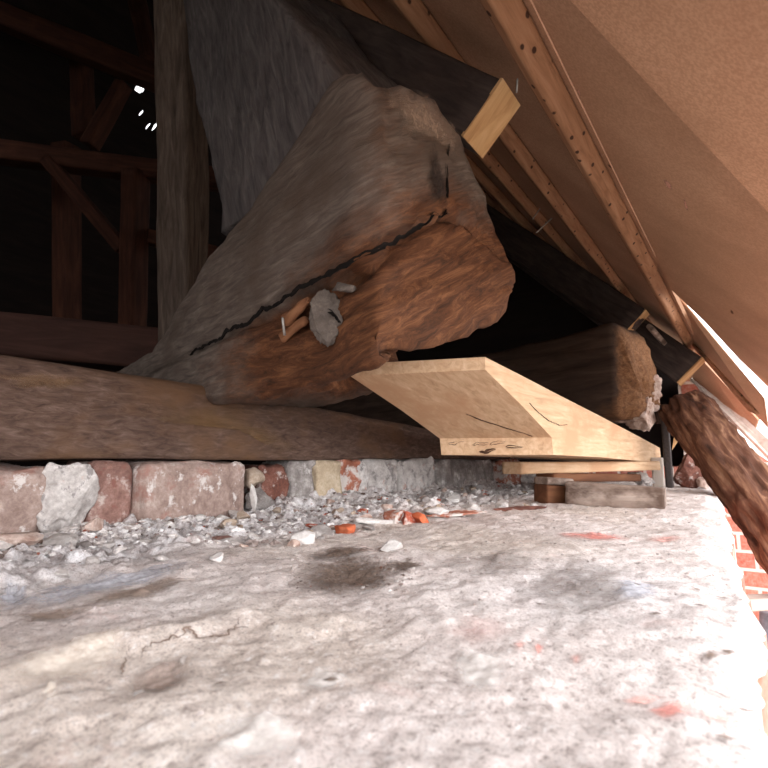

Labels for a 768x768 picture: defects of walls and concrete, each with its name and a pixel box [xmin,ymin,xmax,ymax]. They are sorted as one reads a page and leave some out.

water stain [303,546,420,595]
crack [116,616,249,676]